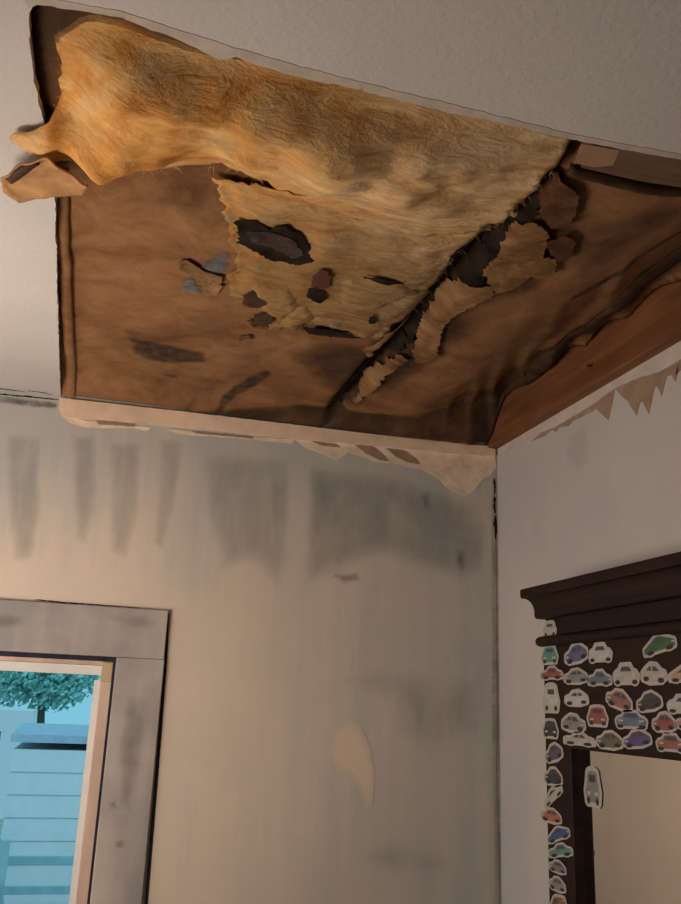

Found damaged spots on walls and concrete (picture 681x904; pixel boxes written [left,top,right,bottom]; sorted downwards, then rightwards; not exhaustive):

leakage [134,341,201,363]
leakage [220,332,554,445]